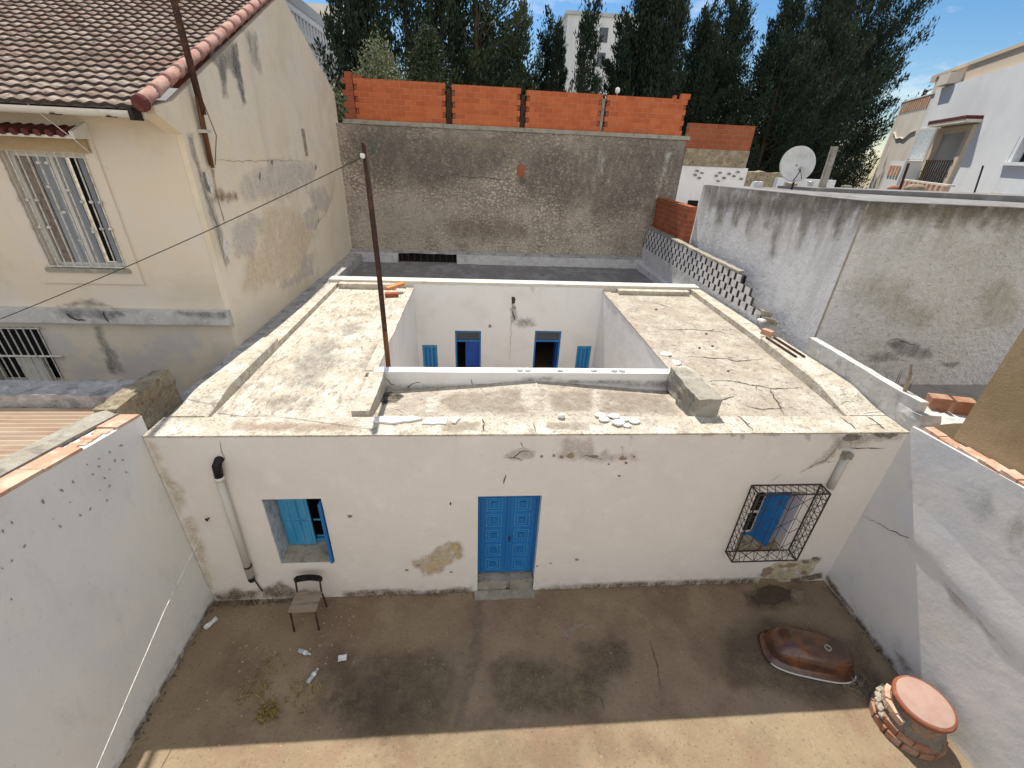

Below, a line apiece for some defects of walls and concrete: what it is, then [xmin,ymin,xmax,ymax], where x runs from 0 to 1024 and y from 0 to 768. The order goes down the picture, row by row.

damp [214,51,240,79]
crack [660,304,883,469]
peeling [405,543,462,574]
peeling [758,557,821,583]